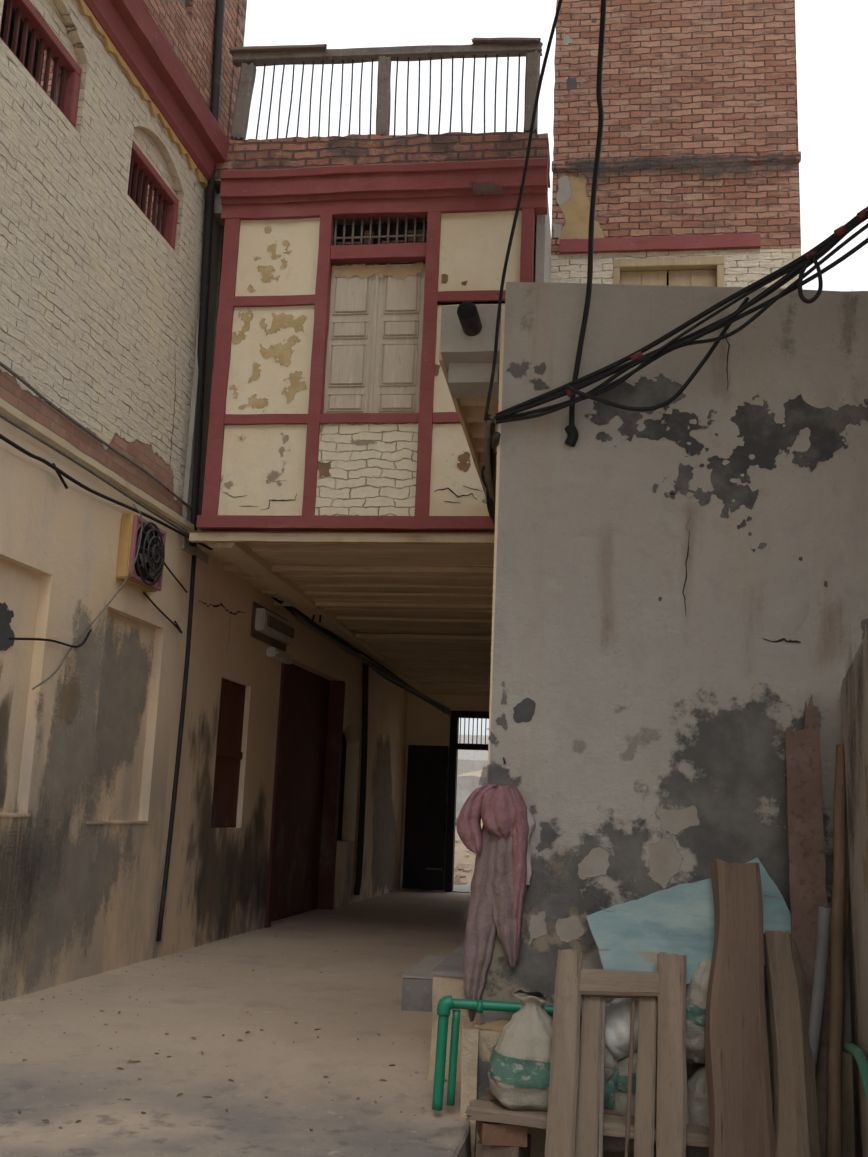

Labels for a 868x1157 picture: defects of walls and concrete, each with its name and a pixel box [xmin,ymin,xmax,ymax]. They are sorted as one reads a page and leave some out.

peeling [245,226,290,292]
peeling [229,309,307,412]
flaking render [507,362,549,390]
flaking render [0,370,183,516]
crack [435,486,483,503]
flaking render [584,372,868,552]
crack [682,518,691,611]
flaking render [488,682,507,745]
damp [0,609,152,998]
flaking render [577,847,610,880]
flaking render [648,805,700,889]
flaking render [528,911,585,945]